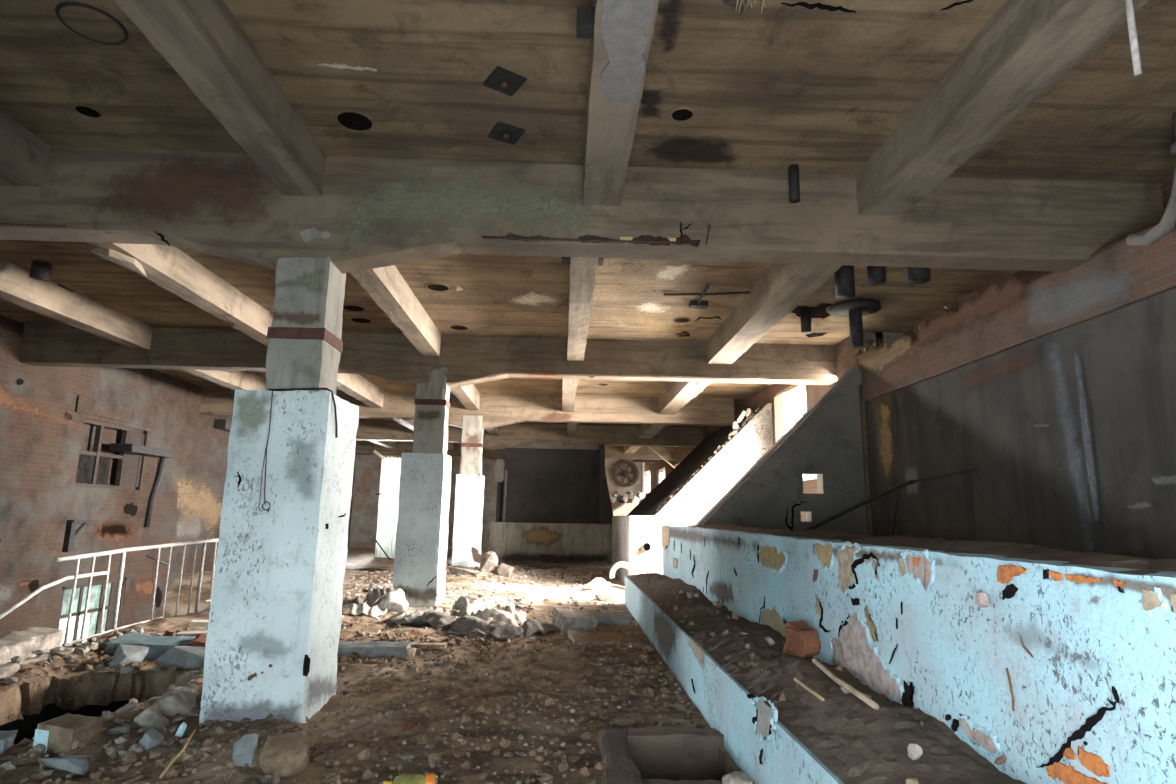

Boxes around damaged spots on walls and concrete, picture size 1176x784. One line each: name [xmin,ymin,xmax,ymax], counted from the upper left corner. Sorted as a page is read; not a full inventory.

crack [781,2,857,13]
crack [940,0,973,11]
peeling [815,541,879,597]
crack [817,552,880,638]
peeling [898,550,936,592]
flaking render [997,564,1027,600]
flaking render [1048,571,1125,587]
peeling [1141,587,1176,617]
peeling [830,610,914,707]
peeling [747,693,778,743]
crack [1036,686,1120,768]
flaking render [1046,746,1111,784]